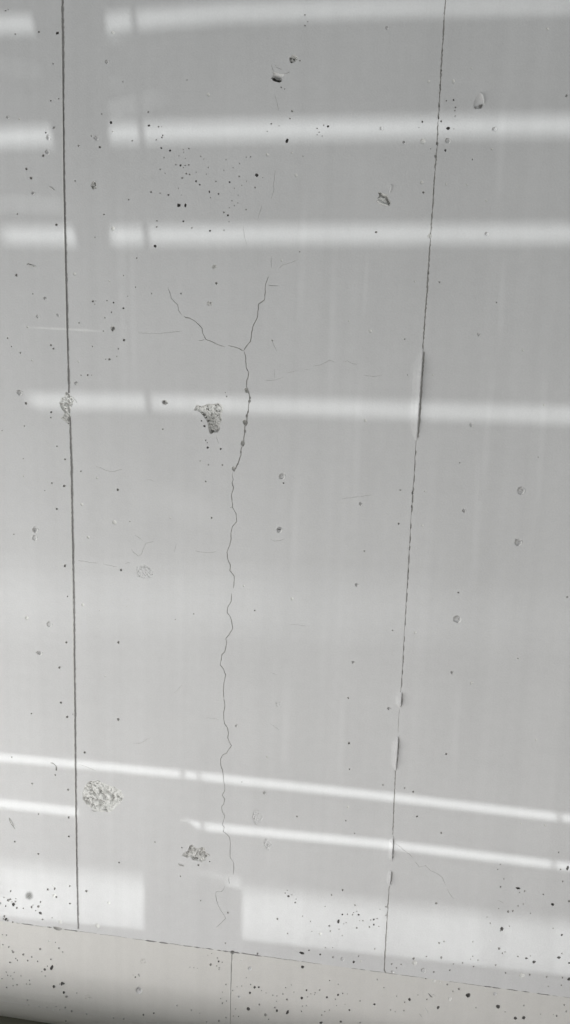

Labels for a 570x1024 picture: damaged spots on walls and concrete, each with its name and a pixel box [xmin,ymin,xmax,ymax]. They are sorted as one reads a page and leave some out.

spalling [194,392,228,450]
crack [79,259,379,926]
spalling [82,780,124,812]
spalling [178,845,210,877]